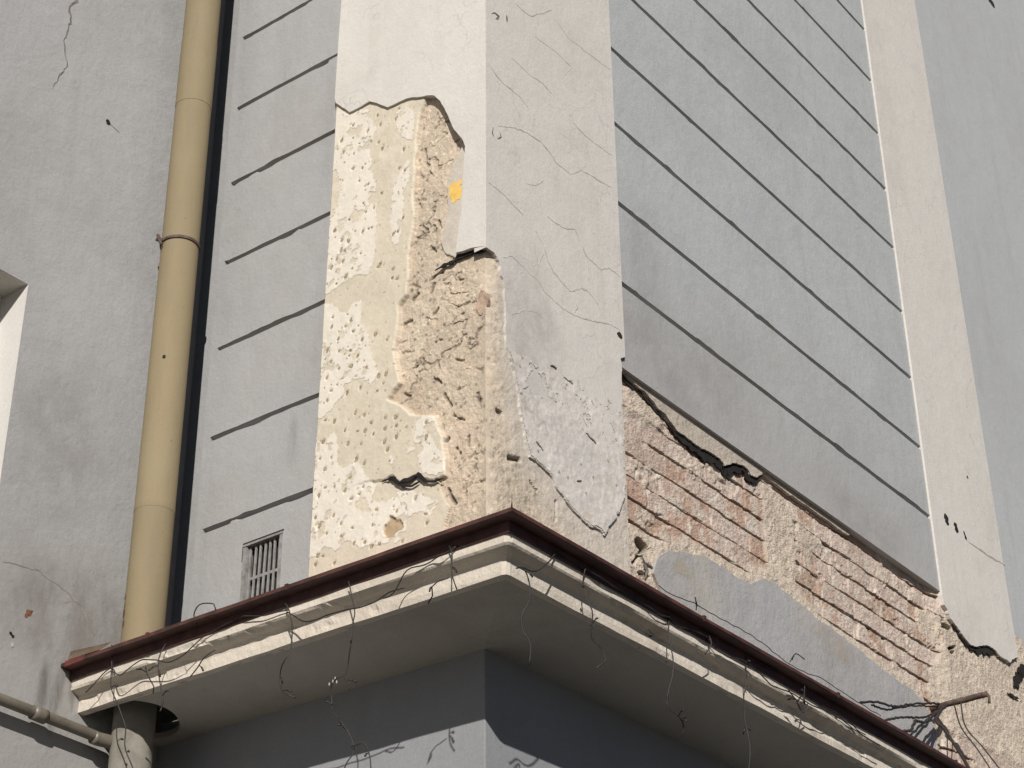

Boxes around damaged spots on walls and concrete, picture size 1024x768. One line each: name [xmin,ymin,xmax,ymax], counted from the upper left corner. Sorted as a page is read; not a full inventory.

crack [53,0,78,91]
flaking render [308,97,1024,768]
crack [622,374,761,484]
crack [382,472,444,488]
crack [952,624,1024,699]